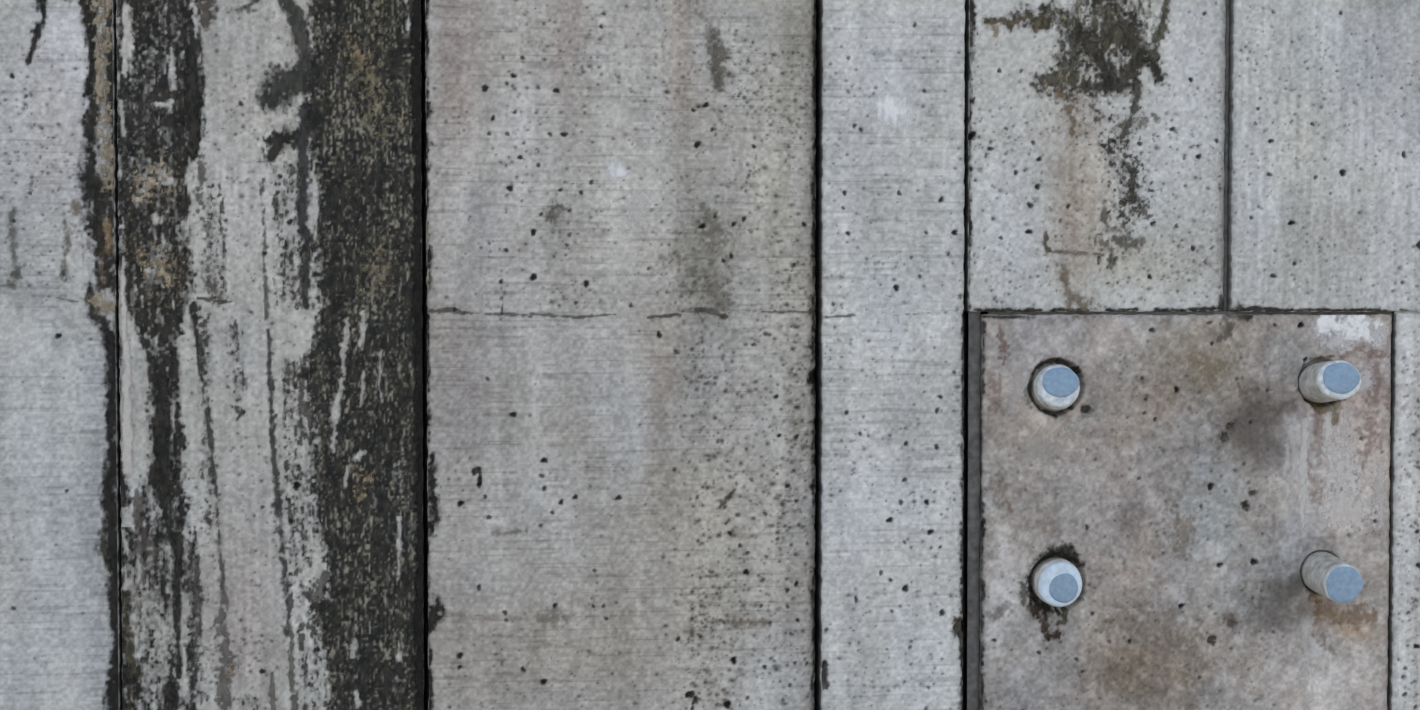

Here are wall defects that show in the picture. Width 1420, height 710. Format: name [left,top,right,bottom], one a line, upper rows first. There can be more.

damp [25,0,47,64]
damp [1043,231,1115,270]
damp [61,0,445,710]